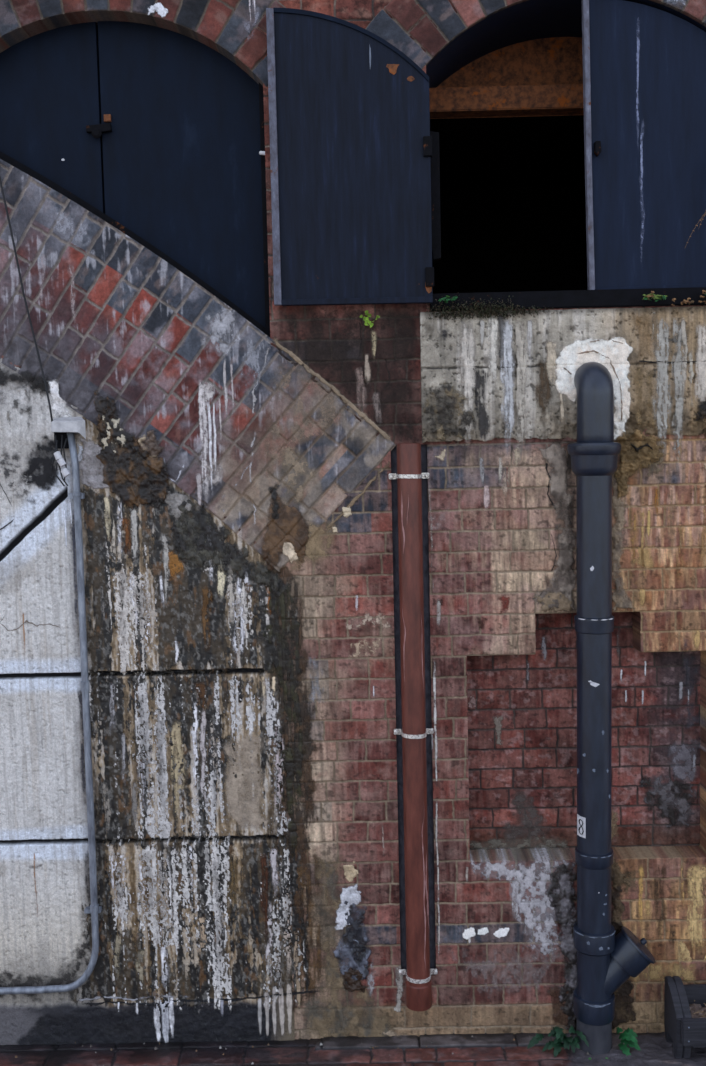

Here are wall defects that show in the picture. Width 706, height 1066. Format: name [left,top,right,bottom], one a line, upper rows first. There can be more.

damp [54,213,87,245]
damp [442,315,564,492]
damp [480,458,490,508]
damp [0,311,322,1046]
damp [346,596,390,657]
spalling [334,862,371,993]
damp [466,848,569,985]